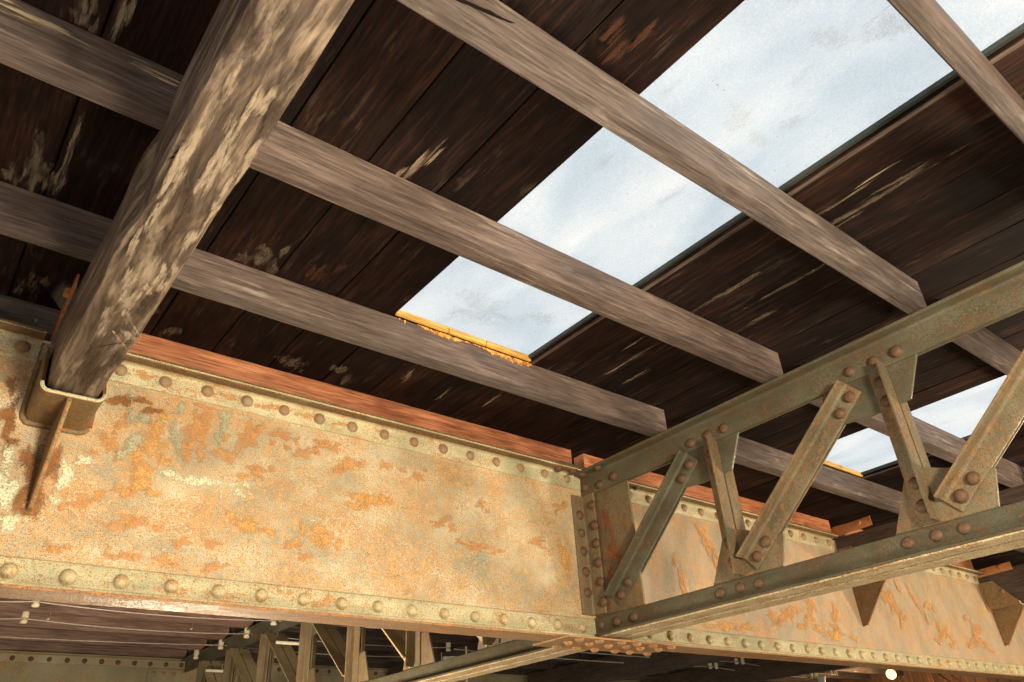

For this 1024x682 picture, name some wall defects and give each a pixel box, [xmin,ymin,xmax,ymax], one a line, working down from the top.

rust [0,354,581,519]
rust [100,514,164,531]
rust [104,538,191,567]
rust [284,518,345,561]
rust [431,515,503,554]
rust [681,497,716,509]
rust [787,524,839,539]
rust [768,598,859,642]
rust [881,580,996,652]